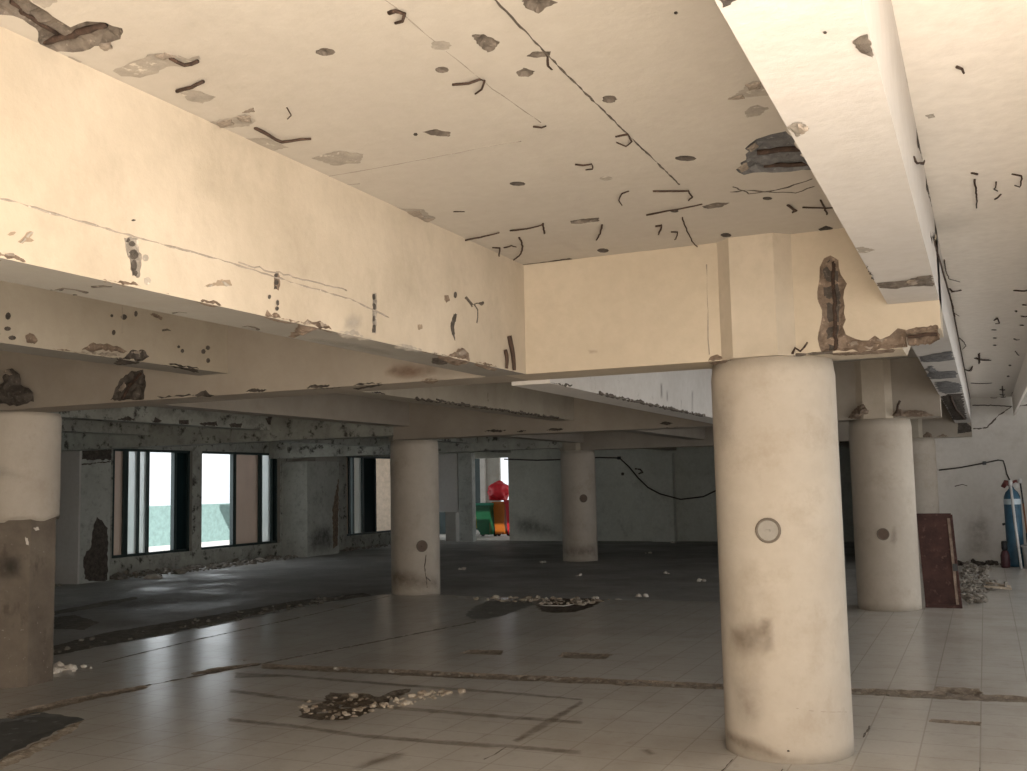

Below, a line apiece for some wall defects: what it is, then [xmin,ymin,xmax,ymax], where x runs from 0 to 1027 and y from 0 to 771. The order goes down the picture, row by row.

spalling [0,0,123,63]
peeling [113,53,200,78]
spalling [472,34,500,52]
spalling [522,0,558,14]
spalling [736,122,811,175]
crack [733,179,815,194]
spalling [103,236,151,288]
crack [0,198,389,318]
spalling [791,232,1013,433]
spalling [75,342,149,401]
spalling [83,517,109,581]